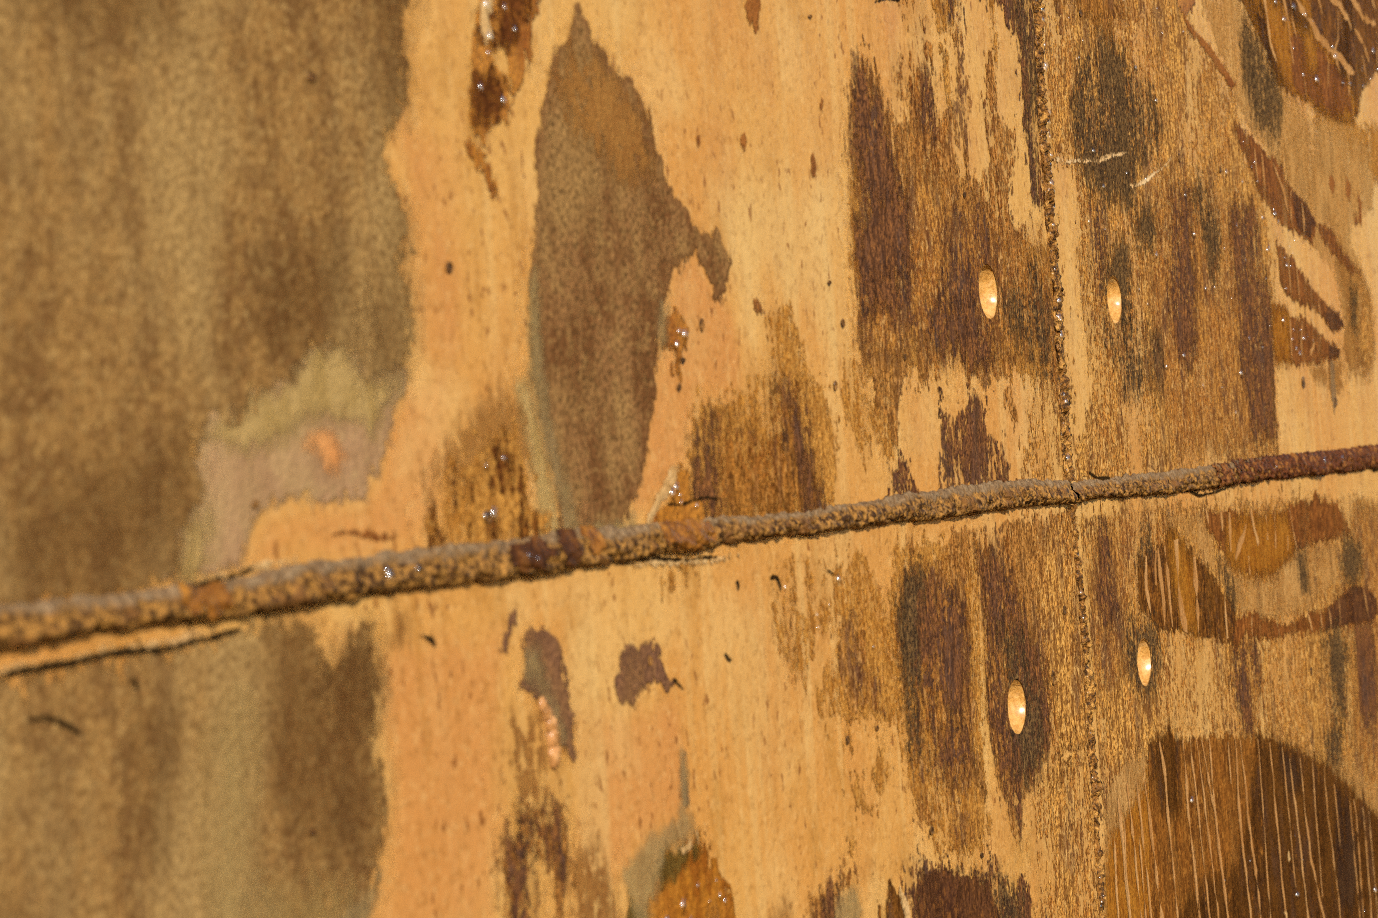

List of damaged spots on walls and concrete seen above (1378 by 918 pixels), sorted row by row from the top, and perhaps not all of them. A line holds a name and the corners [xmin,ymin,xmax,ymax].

leakage [0,610,388,918]
rust [177,581,235,622]
leakage [0,0,416,605]
rust [422,388,607,573]
leakage [515,2,732,533]
rust [654,0,1378,918]